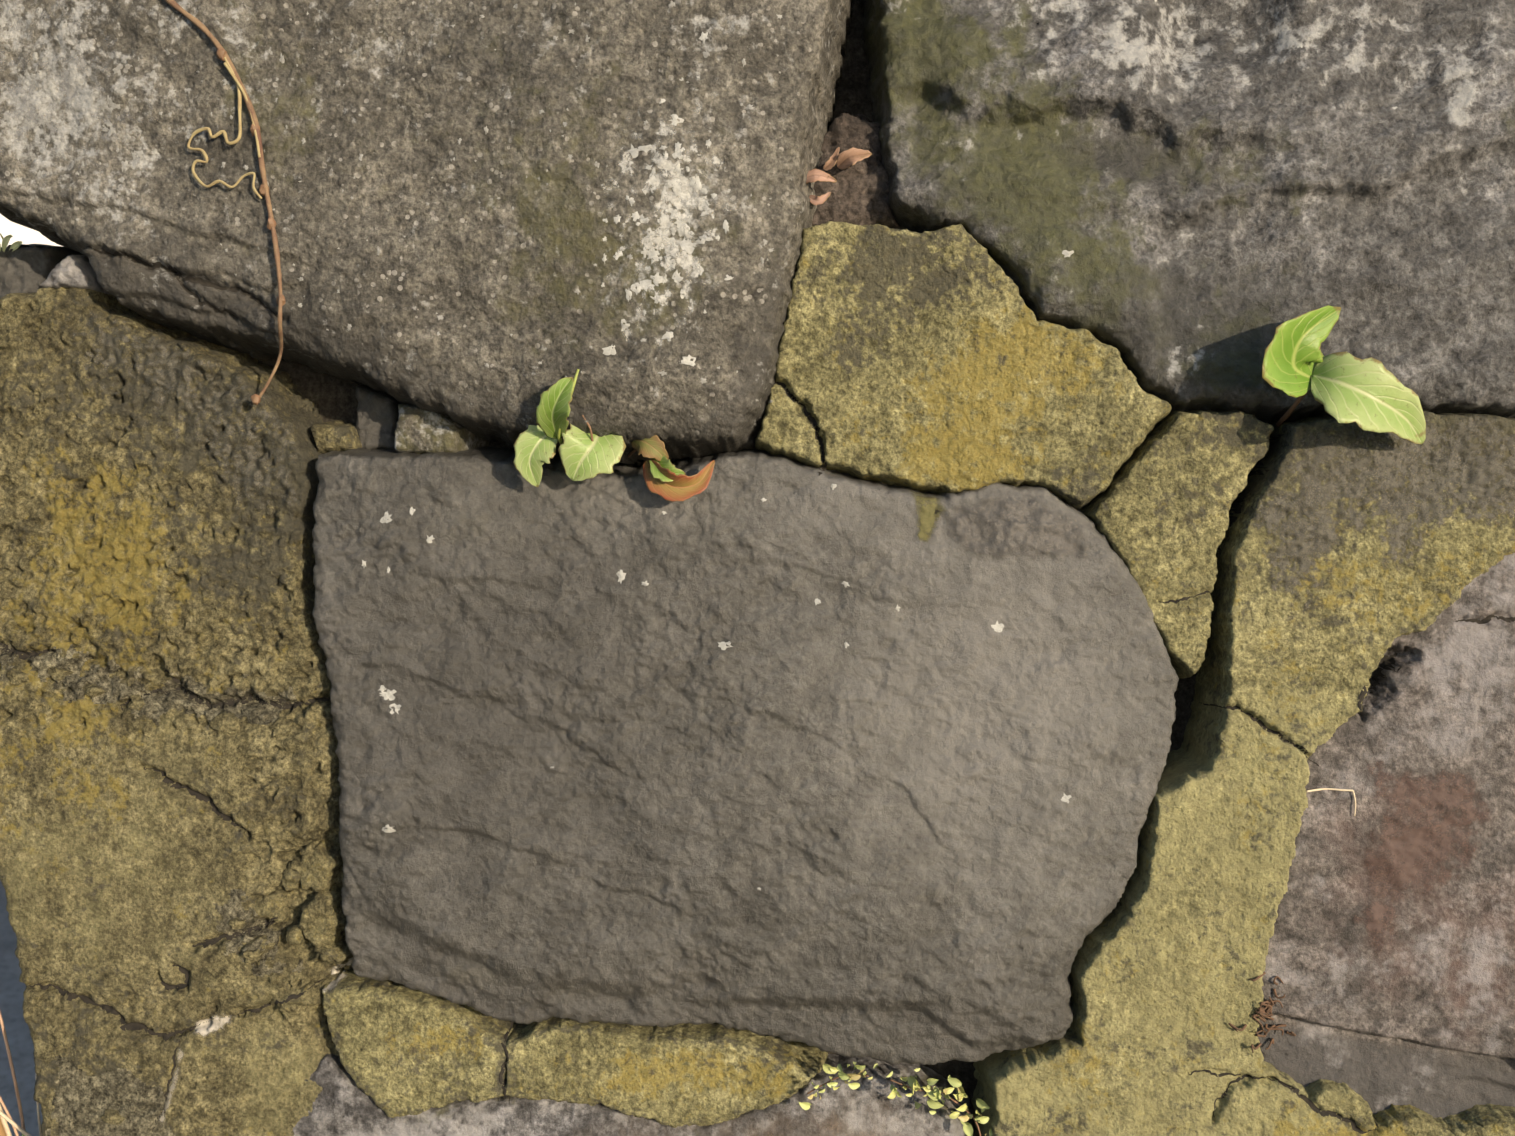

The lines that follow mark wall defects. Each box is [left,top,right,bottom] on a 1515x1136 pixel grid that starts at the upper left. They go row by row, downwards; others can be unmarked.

crack [0,643,55,660]
crack [1455,615,1515,624]
crack [120,669,330,710]
crack [144,767,250,835]
crack [159,917,278,991]
crack [25,974,330,1132]
crack [1188,1069,1378,1134]